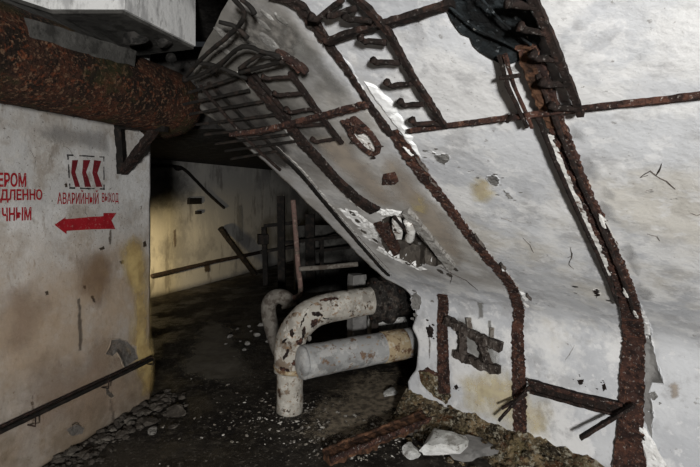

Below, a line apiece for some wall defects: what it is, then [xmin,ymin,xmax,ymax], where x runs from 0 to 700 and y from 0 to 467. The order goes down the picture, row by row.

spalling [447,0,541,64]
spalling [182,0,459,277]
spalling [476,174,523,201]
crack [640,164,675,191]
rust [373,221,401,256]
peeling [599,214,621,250]
peeling [455,208,532,308]
spalling [426,319,437,339]
spalling [105,338,138,368]
spalling [466,336,496,363]
spalling [418,367,461,404]
peeling [633,303,667,467]